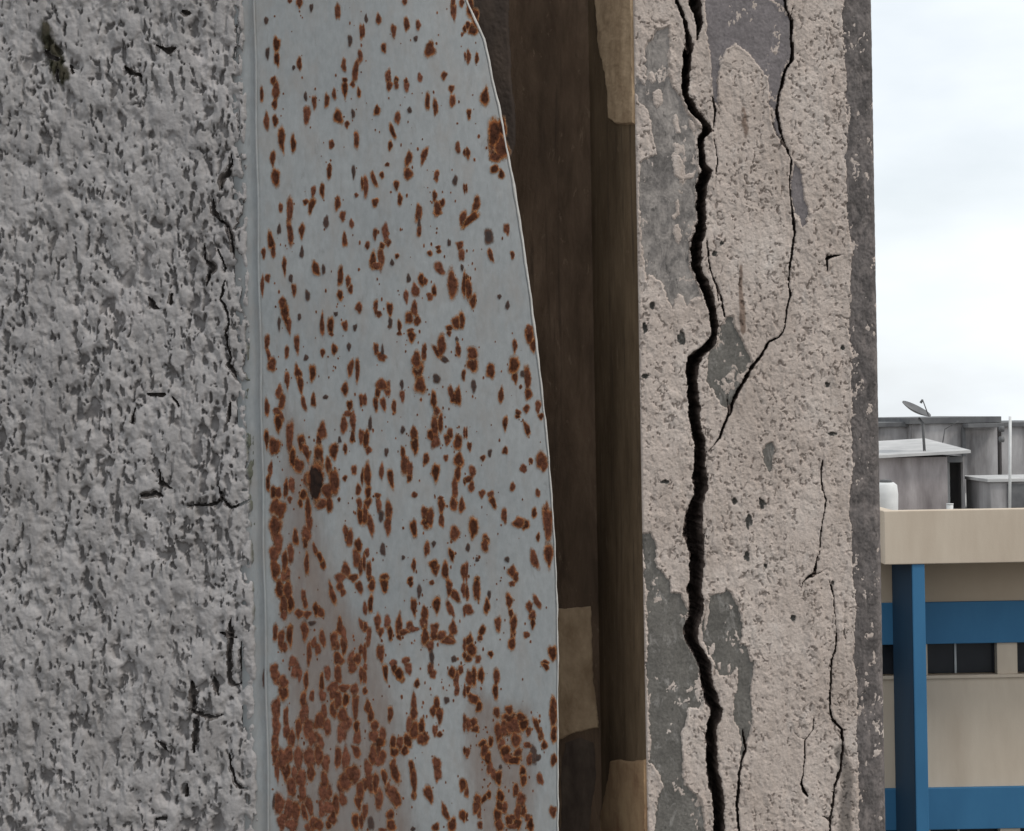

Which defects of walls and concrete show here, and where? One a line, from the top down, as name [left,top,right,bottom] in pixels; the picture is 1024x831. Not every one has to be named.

peeling [595,0,701,310]
peeling [705,0,793,146]
crack [187,480,250,510]
corrosion [260,0,558,831]
peeling [600,533,754,831]
crack [675,0,796,831]
crack [794,460,847,831]